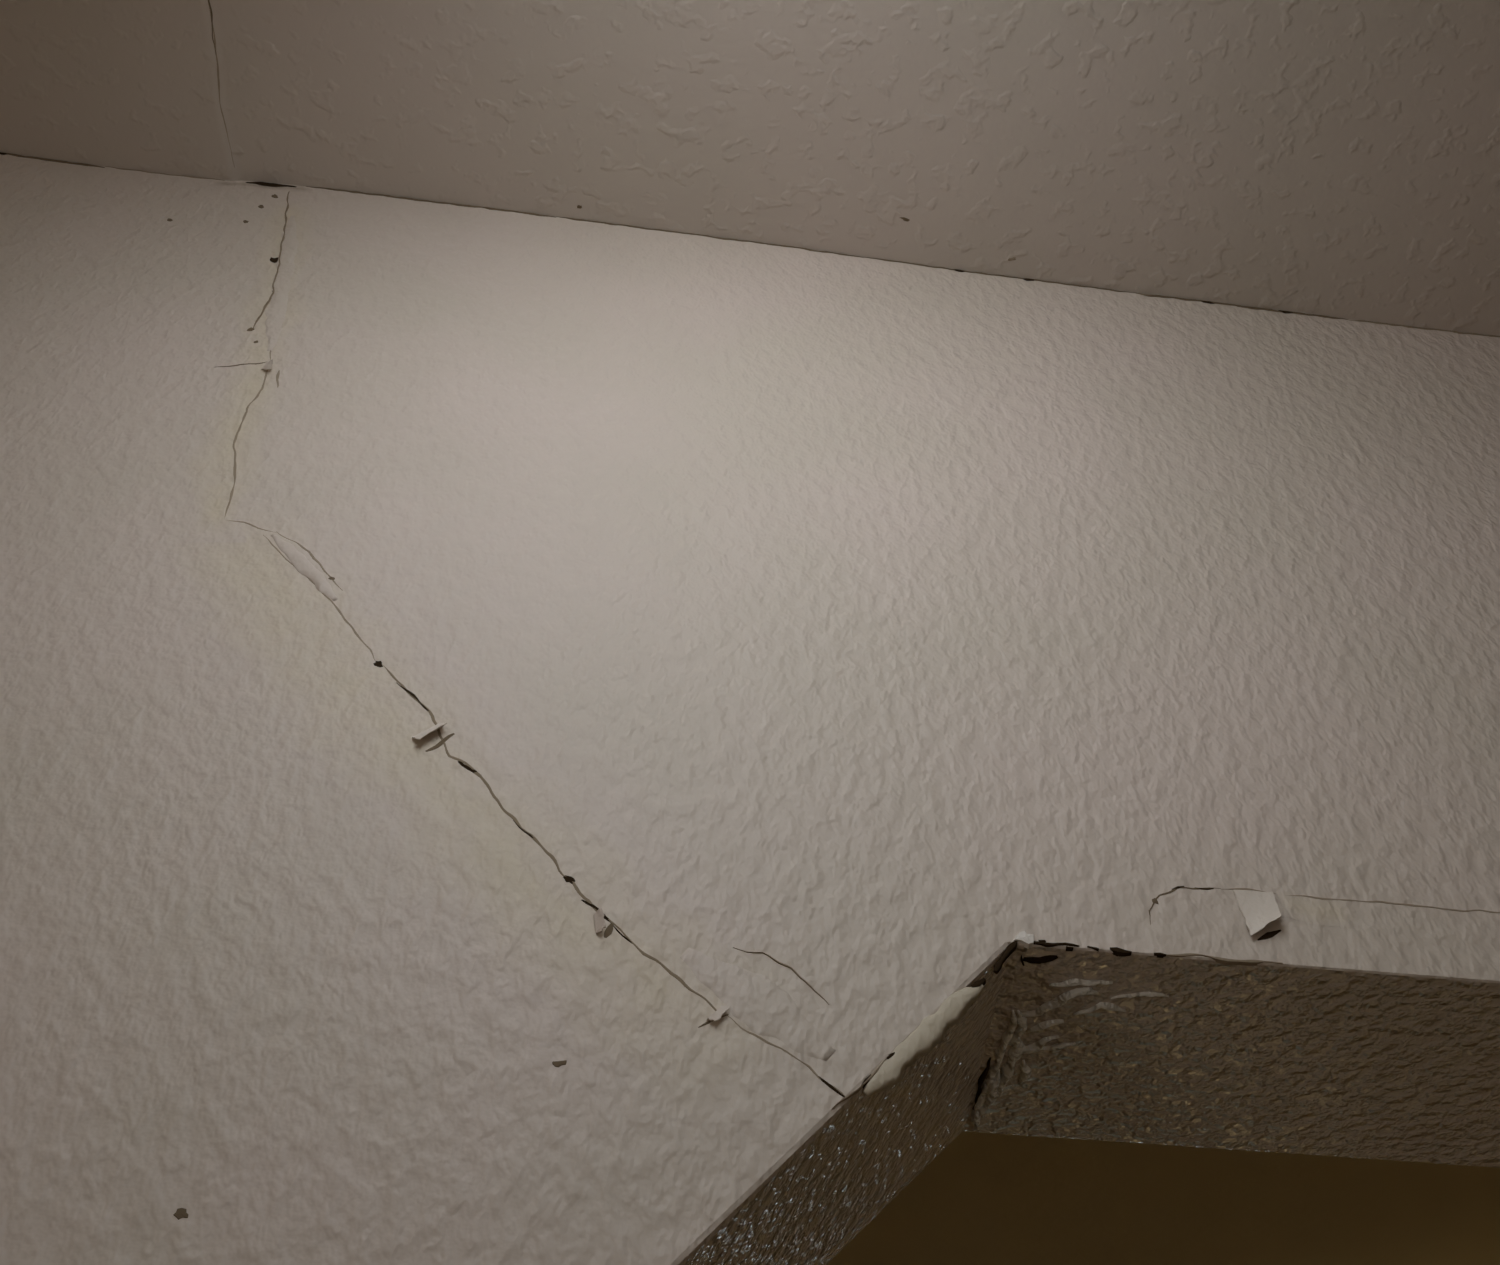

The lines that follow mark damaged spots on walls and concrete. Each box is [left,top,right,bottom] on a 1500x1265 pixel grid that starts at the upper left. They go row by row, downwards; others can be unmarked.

crack [208,0,235,168]
crack [0,152,1500,1097]